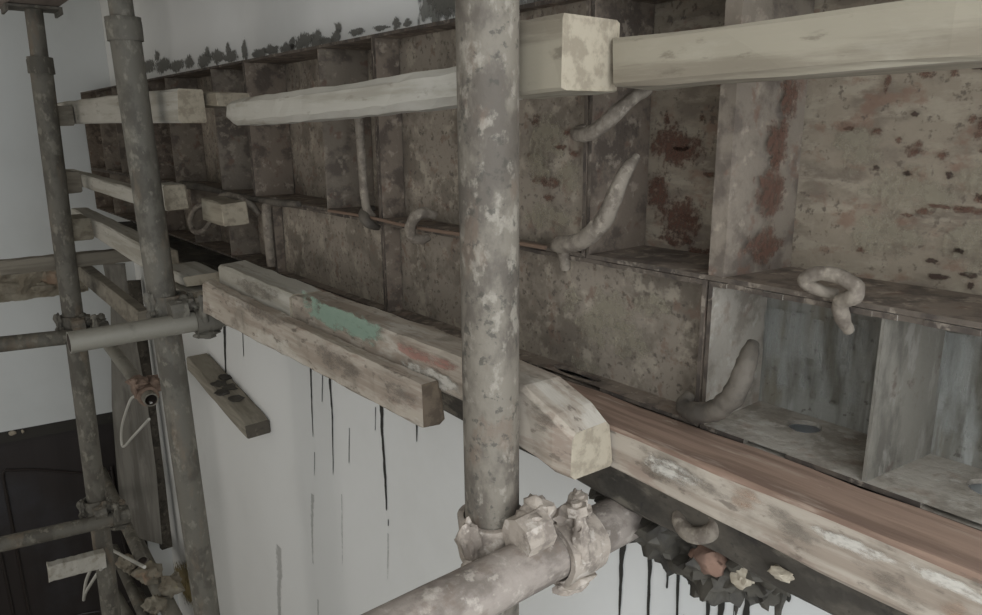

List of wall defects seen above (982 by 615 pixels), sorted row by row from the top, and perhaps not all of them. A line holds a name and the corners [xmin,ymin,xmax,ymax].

rust [648,111,713,254]
rust [900,194,982,217]
rust [926,258,977,290]
water stain [310,368,333,456]
water stain [375,406,389,526]
water stain [618,545,626,615]
water stain [666,573,680,615]
water stain [706,599,750,615]
spalling [730,568,755,590]
spalling [767,564,795,583]